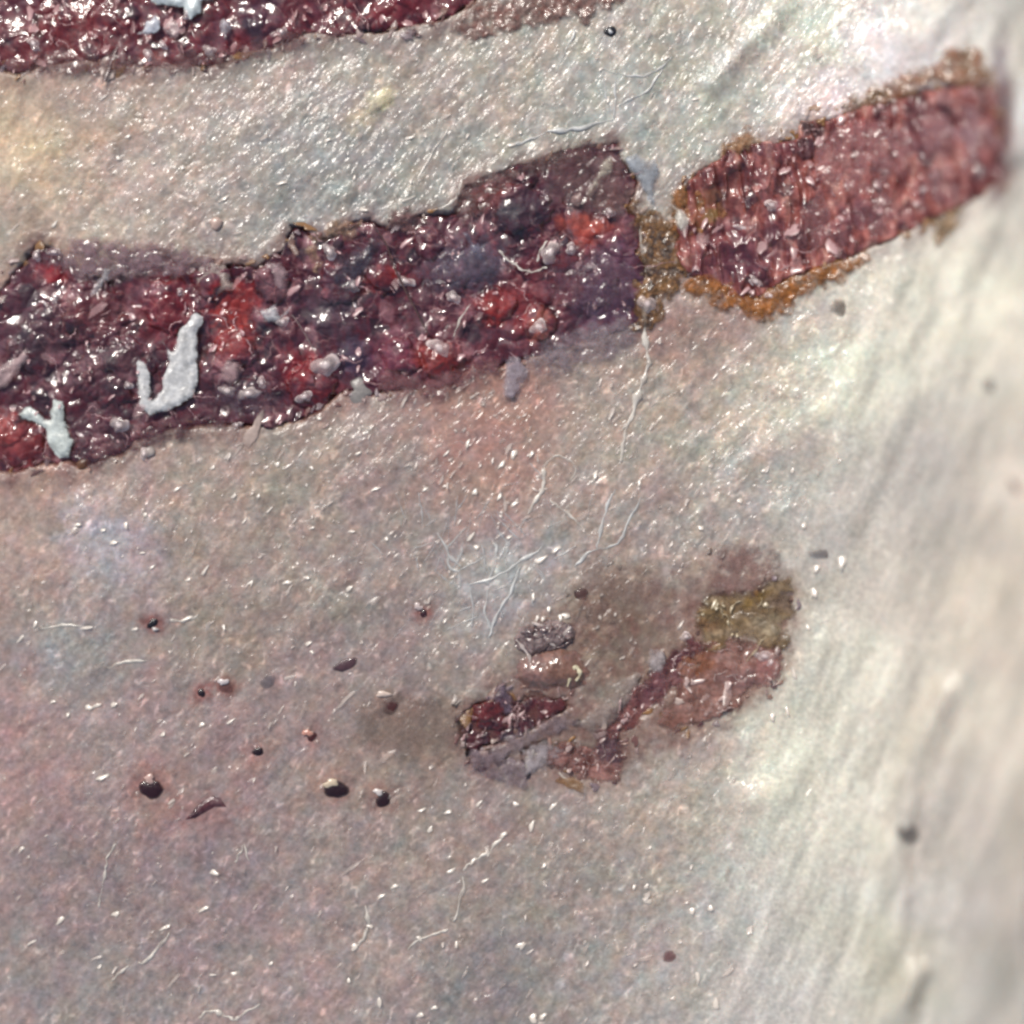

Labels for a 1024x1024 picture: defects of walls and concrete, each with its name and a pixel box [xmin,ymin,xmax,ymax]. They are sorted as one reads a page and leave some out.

peeling [144,0,200,35]
peeling [575,142,657,202]
peeling [0,353,26,385]
peeling [137,314,202,414]
peeling [225,362,237,380]
peeling [21,400,72,458]
peeling [422,443,556,627]
peeling [517,546,570,622]